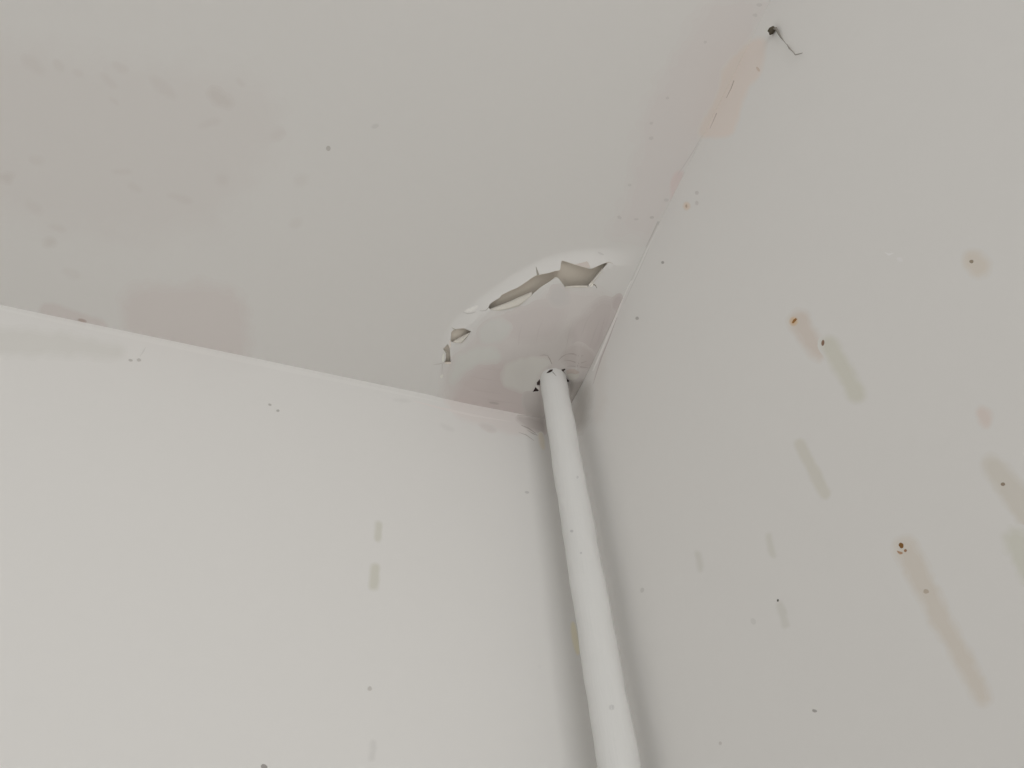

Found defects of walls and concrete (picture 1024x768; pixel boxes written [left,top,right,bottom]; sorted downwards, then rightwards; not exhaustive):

peeling [427,245,646,397]
corrosion [890,533,995,710]